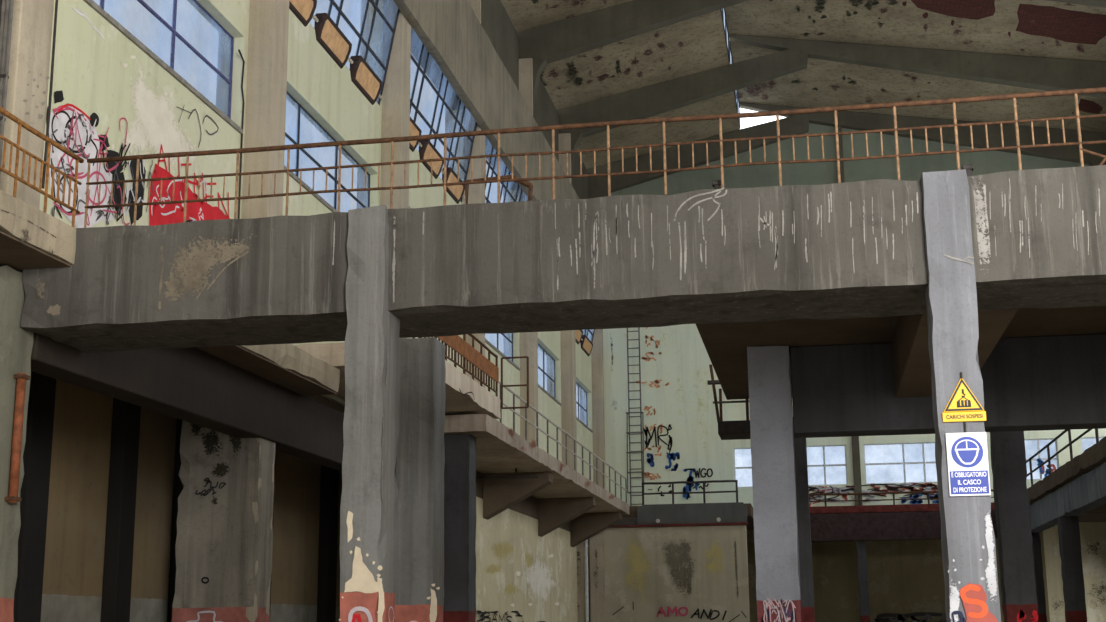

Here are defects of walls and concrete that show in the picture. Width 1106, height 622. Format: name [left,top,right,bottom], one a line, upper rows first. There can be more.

leakage [796,0,827,36]
leakage [845,0,898,28]
spalling [902,0,995,26]
spalling [1008,4,1106,49]
leakage [541,34,685,89]
leakage [210,435,241,478]
peeling [341,511,385,622]
leakage [621,534,739,601]